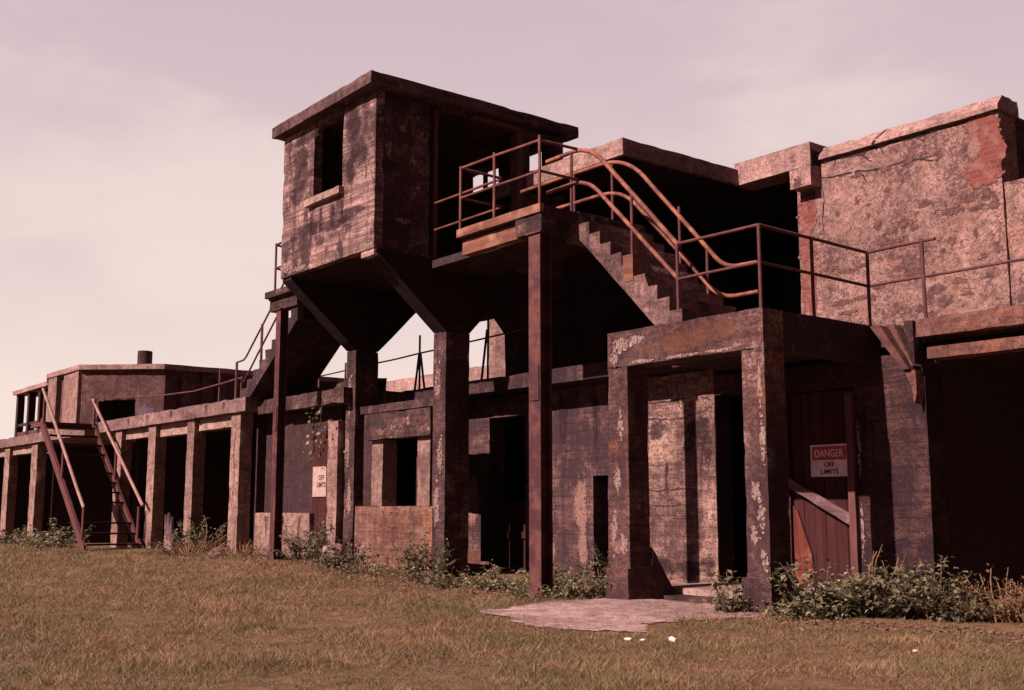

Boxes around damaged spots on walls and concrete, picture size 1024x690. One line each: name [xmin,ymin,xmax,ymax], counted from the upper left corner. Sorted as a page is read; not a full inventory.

leakage [290,129,318,205]
leakage [290,201,365,242]
leakage [346,109,367,182]
flaking render [792,178,866,316]
crack [820,124,959,230]
flaking render [855,113,1007,279]
spalling [831,285,885,315]
peeling [757,361,767,465]
peeling [750,479,770,573]